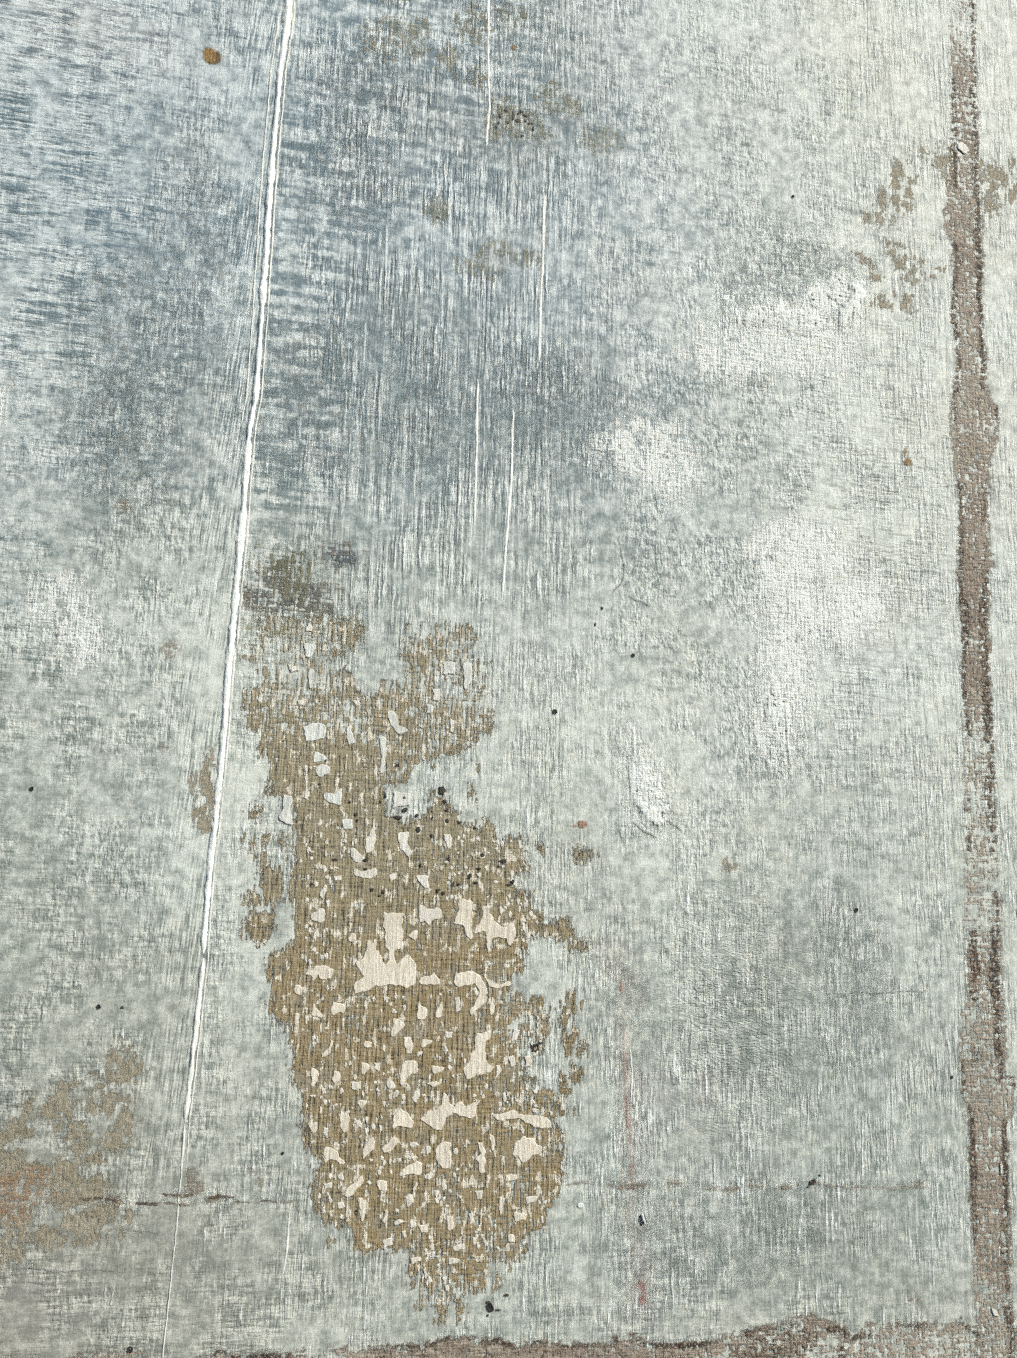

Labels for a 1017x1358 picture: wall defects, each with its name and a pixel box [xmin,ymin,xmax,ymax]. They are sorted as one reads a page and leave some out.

corrosion [203,47,221,64]
peeling [327,0,1017,1358]
peeling [239,613,594,1328]
peeling [0,1036,149,1271]
crack [79,1192,293,1232]
peeling [69,1346,177,1358]
peeling [196,1347,328,1358]